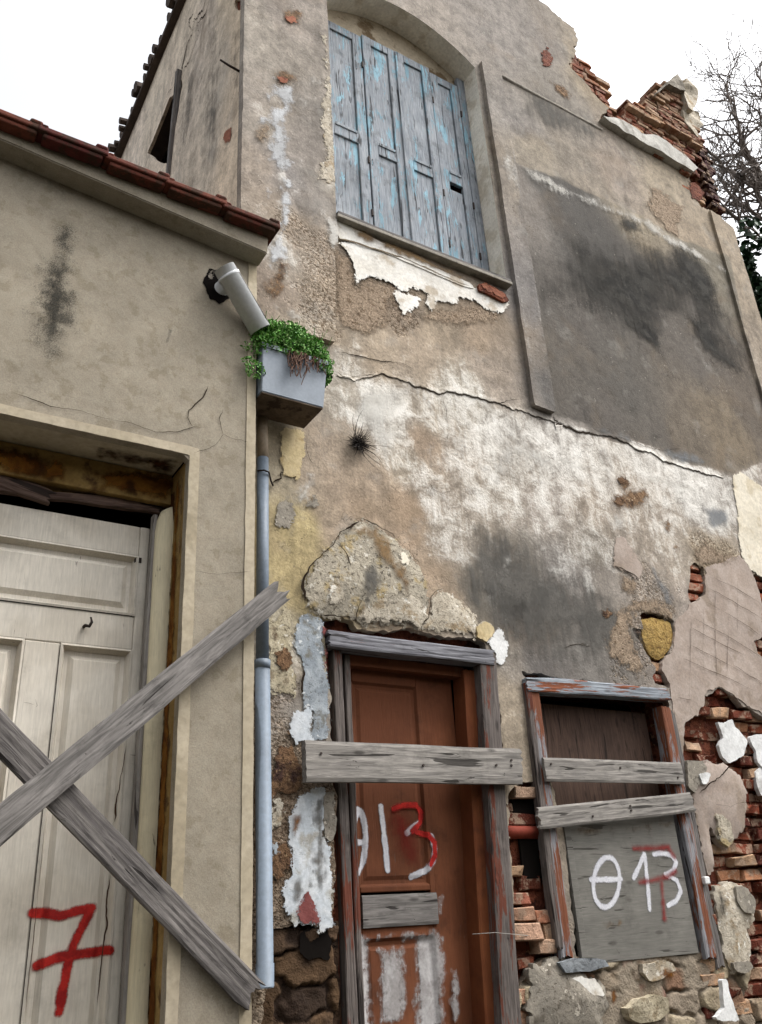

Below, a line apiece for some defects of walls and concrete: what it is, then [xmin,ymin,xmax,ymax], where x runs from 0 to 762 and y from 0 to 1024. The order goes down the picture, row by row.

flaking render [570,58,617,117]
spalling [680,78,704,137]
leakage [533,173,565,192]
leakage [36,227,75,354]
peeling [328,219,509,336]
leakage [569,217,742,370]
crack [10,387,247,452]
peeling [273,427,319,529]
crack [337,352,724,478]
flaking render [261,606,341,1024]
flaking render [506,786,536,826]
flaking render [512,688,762,1024]